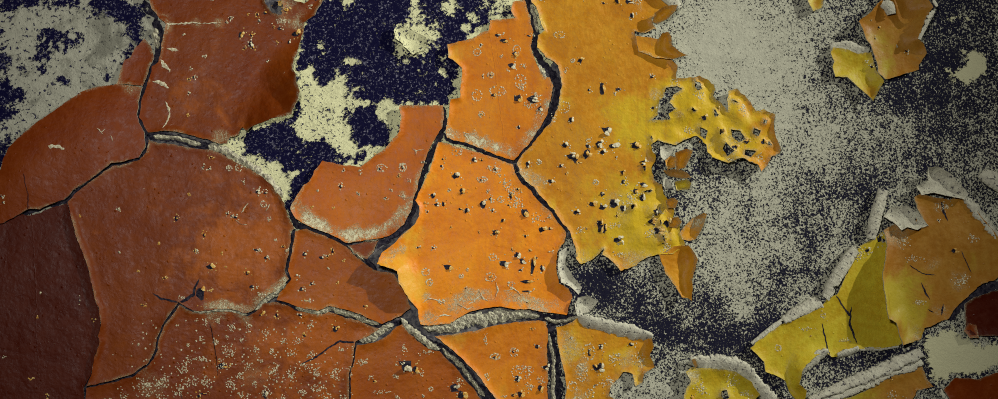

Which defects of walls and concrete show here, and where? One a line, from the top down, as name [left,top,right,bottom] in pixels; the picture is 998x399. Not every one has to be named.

peeling [0,0,166,224]
crack [21,0,577,399]
peeling [219,0,553,233]
peeling [542,0,998,399]